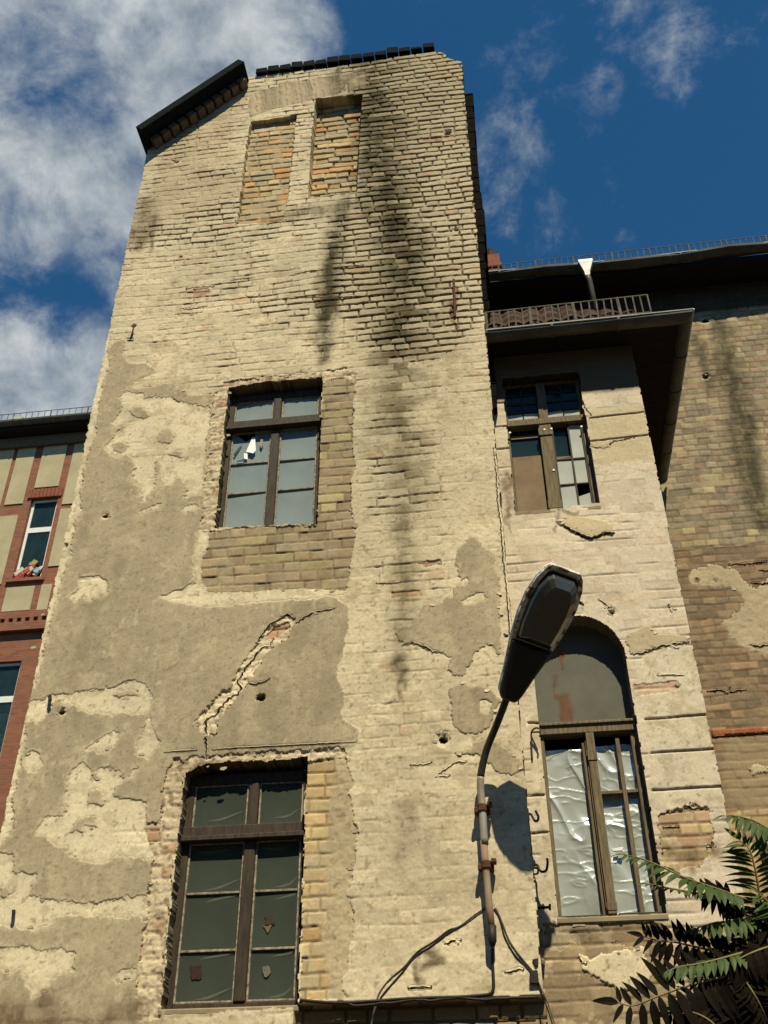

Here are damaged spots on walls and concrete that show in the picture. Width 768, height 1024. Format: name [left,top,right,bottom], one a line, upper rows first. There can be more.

flaking render [0,332,215,930]
flaking render [161,375,358,607]
crack [164,608,356,759]
flaking render [418,560,442,568]
flaking render [558,516,615,536]
flaking render [299,757,359,1000]
flaking render [657,805,716,872]
flaking render [543,921,658,991]